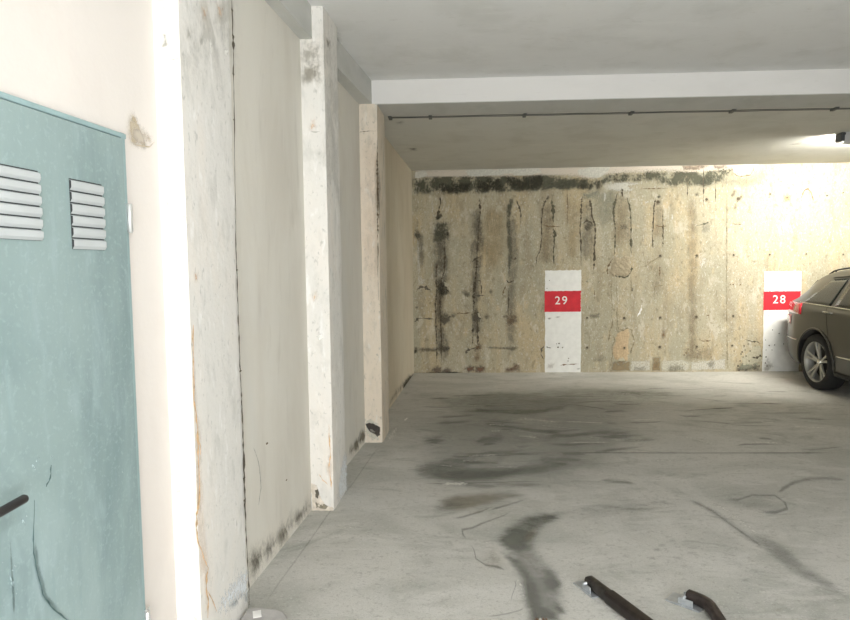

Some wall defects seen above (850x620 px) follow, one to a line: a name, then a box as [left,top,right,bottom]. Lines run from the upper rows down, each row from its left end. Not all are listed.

leakage [414,165,754,201]
leakage [415,232,449,295]
leakage [414,312,488,324]
spalling [608,319,635,368]
leakage [612,361,629,371]